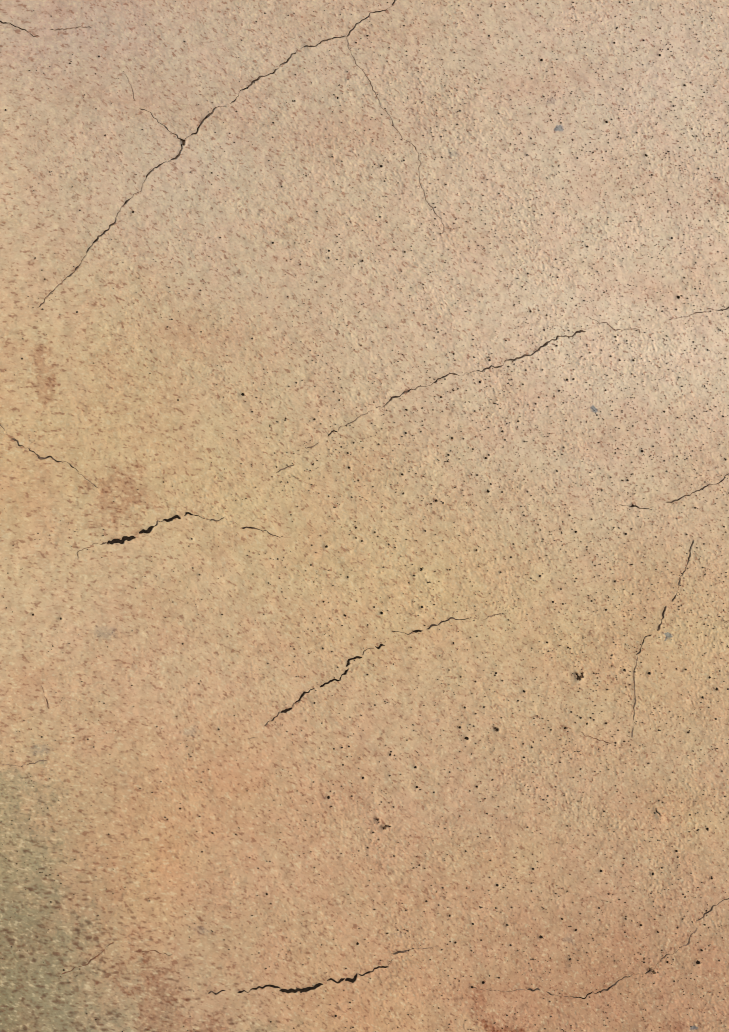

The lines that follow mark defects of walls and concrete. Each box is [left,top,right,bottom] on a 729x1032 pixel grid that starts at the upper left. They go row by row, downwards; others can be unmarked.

crack [0,21,90,37]
crack [39,0,444,307]
crack [276,316,640,473]
crack [0,425,98,488]
crack [77,512,280,556]
crack [249,613,507,739]
crack [208,946,436,995]
crack [474,898,729,999]